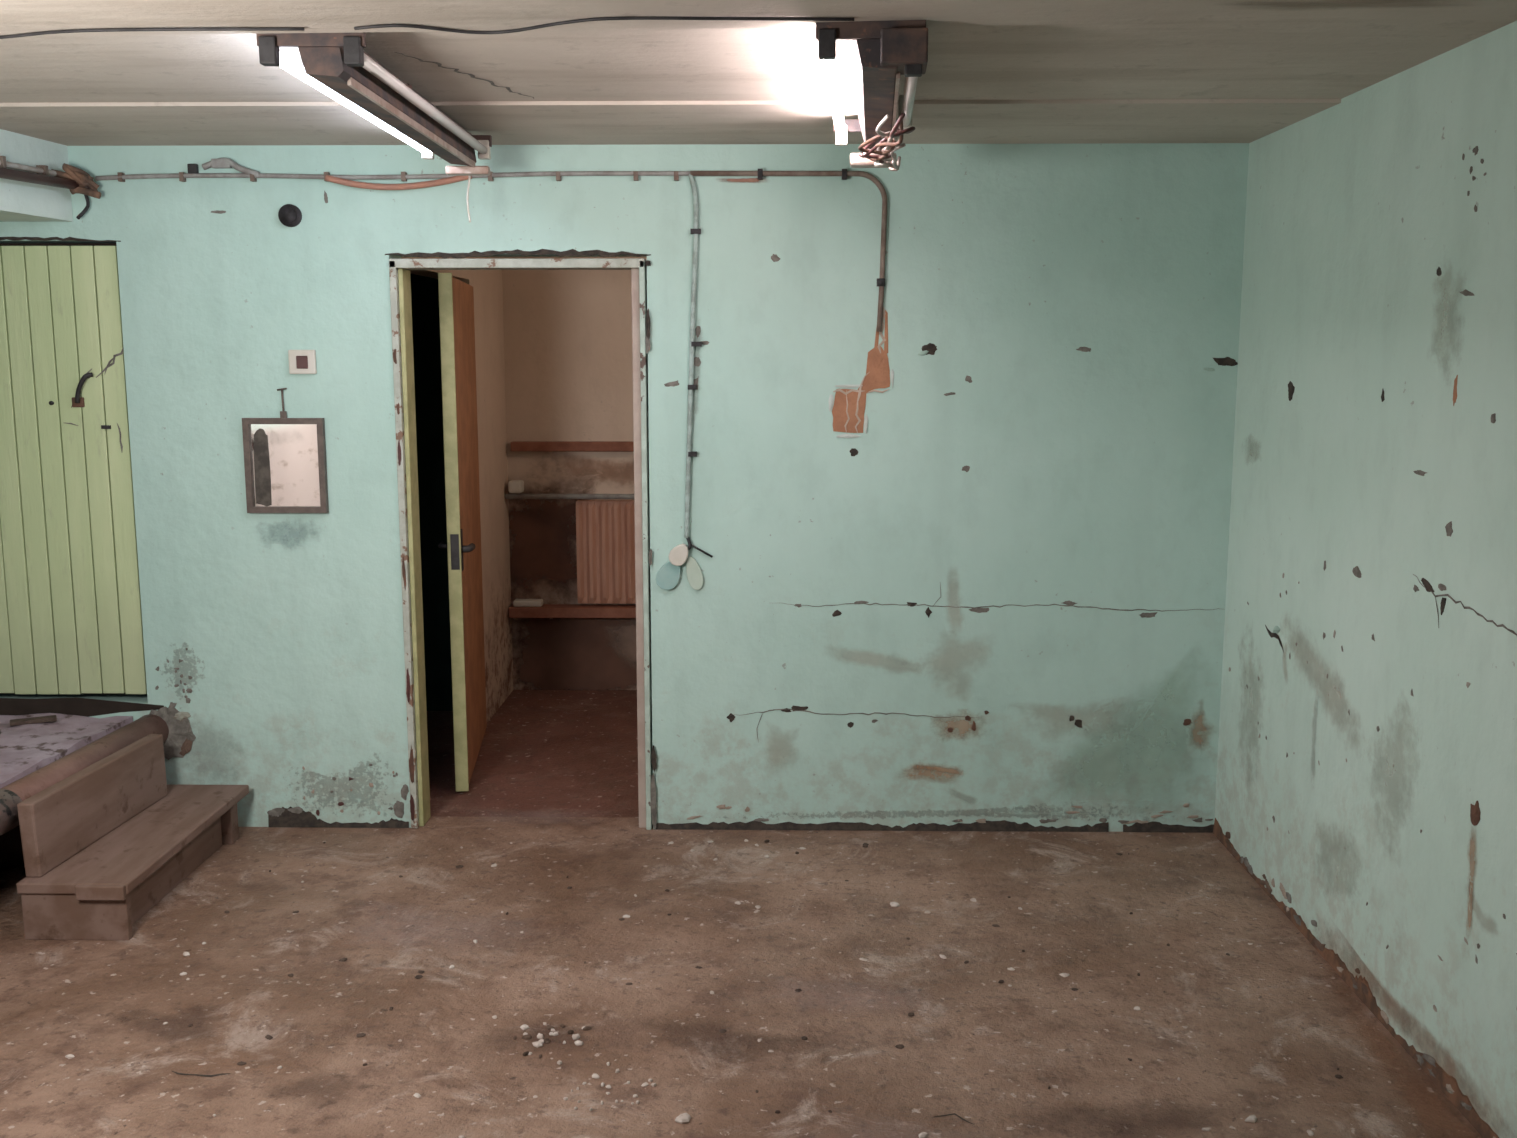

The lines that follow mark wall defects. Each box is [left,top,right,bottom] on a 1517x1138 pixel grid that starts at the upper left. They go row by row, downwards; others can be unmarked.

flaking render [828,307,894,438]
peeling [303,764,374,816]
peeling [377,746,415,822]